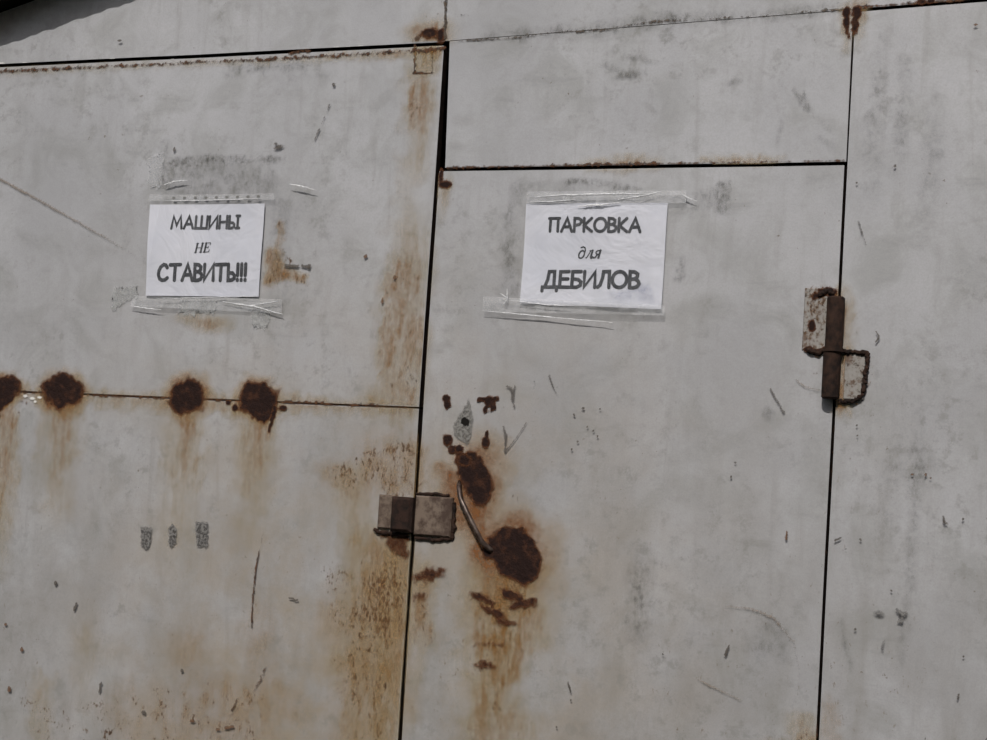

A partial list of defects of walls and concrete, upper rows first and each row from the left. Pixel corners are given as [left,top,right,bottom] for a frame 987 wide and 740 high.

rust [842,0,962,39]
rust [266,250,306,283]
rust [804,287,838,356]
rust [0,372,413,450]
rust [477,395,499,413]
rust [335,444,422,497]
rust [437,430,546,686]
rust [335,535,445,740]